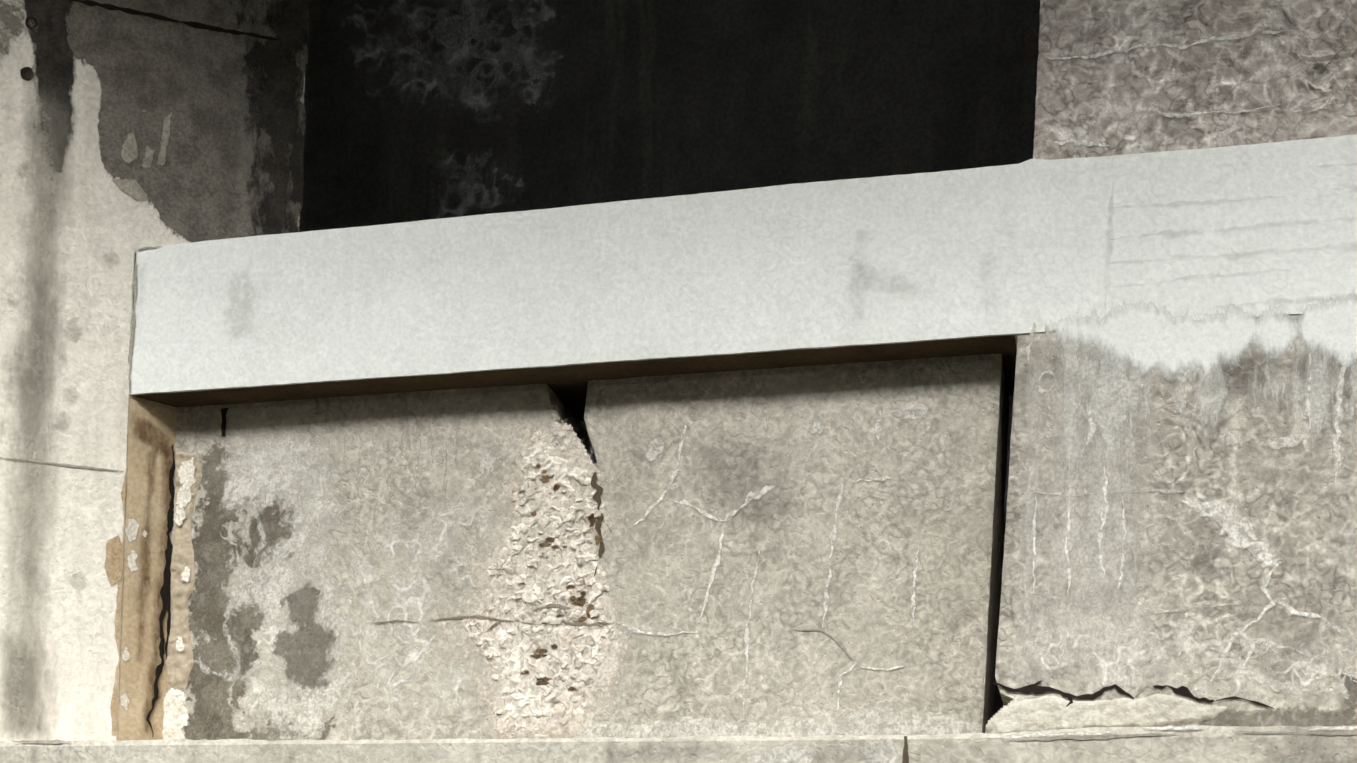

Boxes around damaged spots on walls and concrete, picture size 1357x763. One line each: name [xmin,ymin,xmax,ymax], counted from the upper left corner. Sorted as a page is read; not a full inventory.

leakage [0,0,310,600]
leakage [9,650,39,728]
crack [0,457,125,472]
corrosion [105,473,126,735]
corrosion [140,522,168,731]
corrosion [136,419,173,513]
crack [146,445,175,737]
leakage [194,431,488,741]
spalling [432,405,629,739]
crack [373,426,775,636]
crack [793,476,904,712]
leakage [1000,322,1357,727]